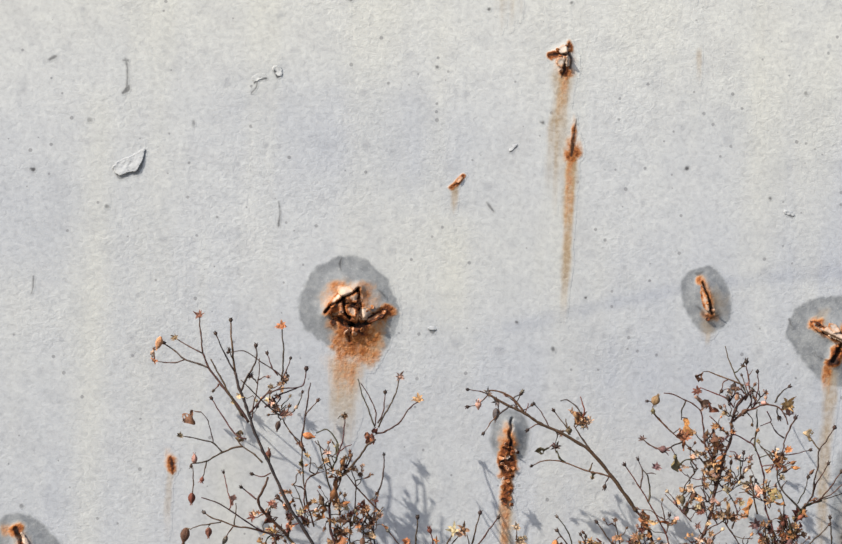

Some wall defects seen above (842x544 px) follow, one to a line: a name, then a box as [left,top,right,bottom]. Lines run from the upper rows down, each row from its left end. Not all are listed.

rust [446,171,468,216]
rust [543,38,586,323]